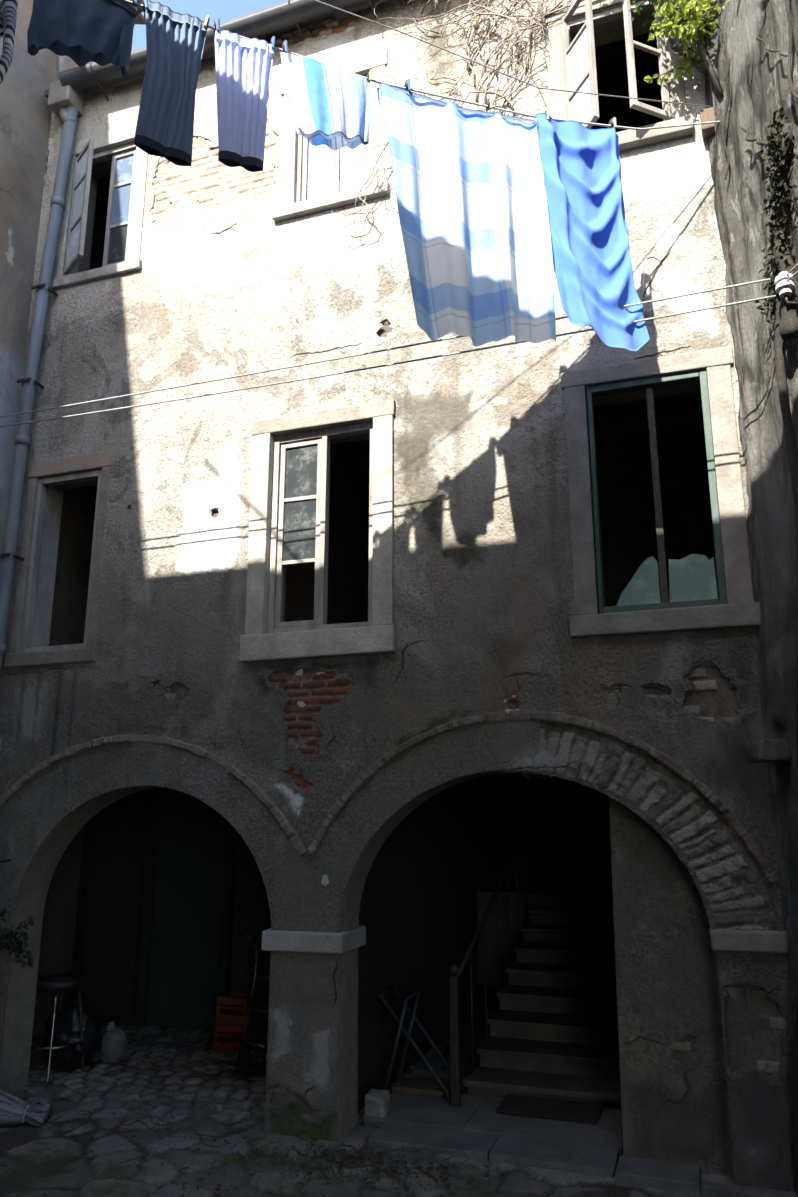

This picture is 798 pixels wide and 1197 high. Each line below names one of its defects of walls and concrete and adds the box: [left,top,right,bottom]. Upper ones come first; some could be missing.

flaking render [146,110,281,225]
spalling [368,317,399,345]
crack [643,253,669,302]
water stain [398,394,476,562]
crack [392,640,423,686]
flaking render [257,660,359,795]